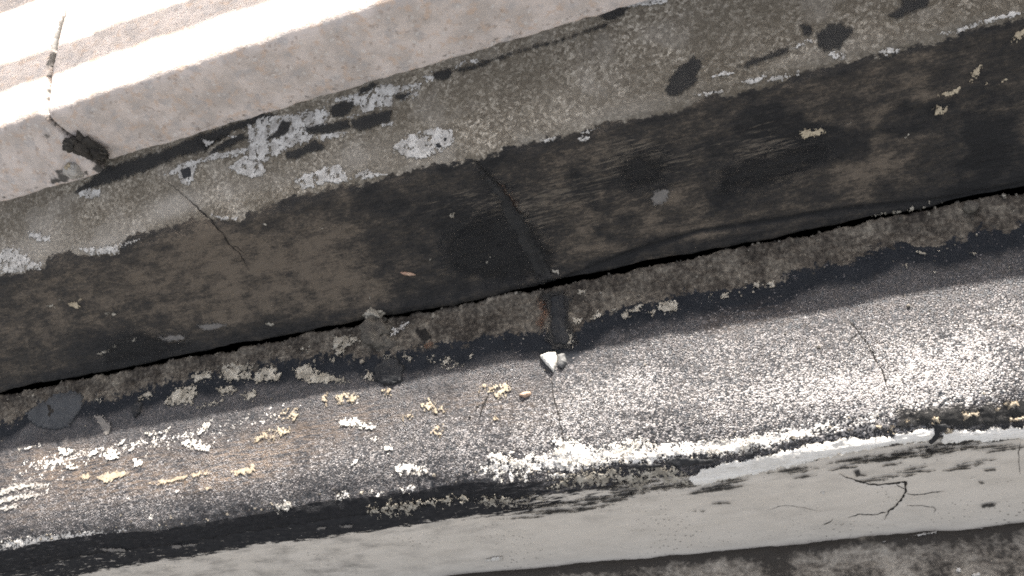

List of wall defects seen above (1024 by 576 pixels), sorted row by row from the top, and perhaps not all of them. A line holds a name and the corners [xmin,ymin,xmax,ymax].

peeling [164,71,434,189]
leakage [622,155,669,205]
crack [171,185,248,268]
leakage [198,321,227,330]
leakage [93,415,110,435]
leakage [181,422,211,451]
leakage [767,438,1024,483]
leakage [81,470,129,483]
leakage [149,470,210,491]
leakage [0,482,49,511]
crack [770,475,944,525]